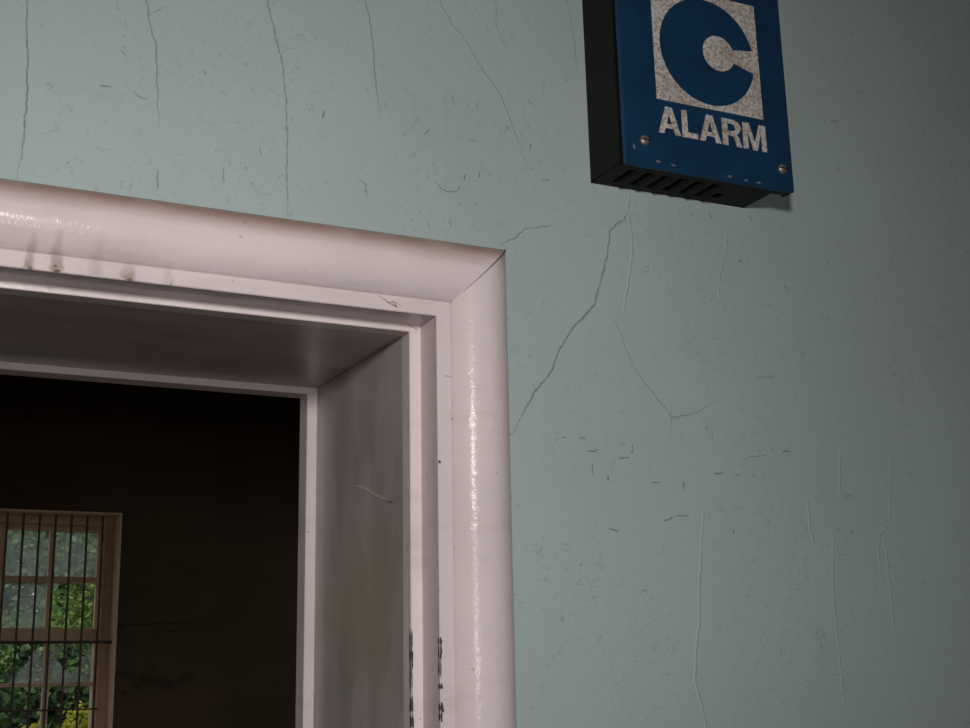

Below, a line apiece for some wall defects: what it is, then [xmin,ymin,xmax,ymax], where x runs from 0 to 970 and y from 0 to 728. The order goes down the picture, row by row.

crack [463,226,545,292]